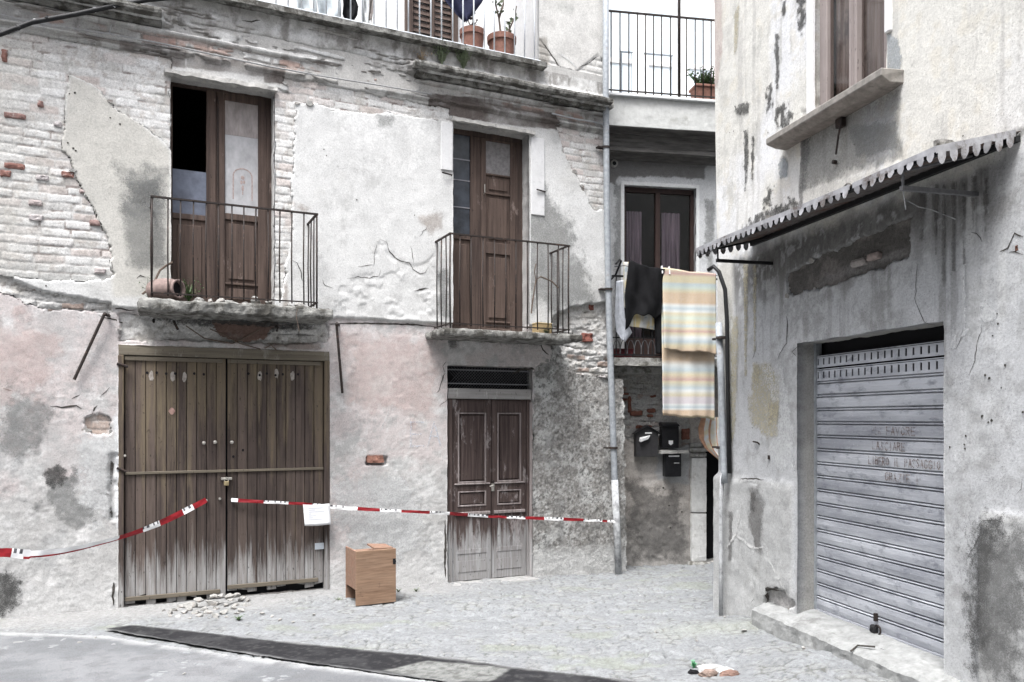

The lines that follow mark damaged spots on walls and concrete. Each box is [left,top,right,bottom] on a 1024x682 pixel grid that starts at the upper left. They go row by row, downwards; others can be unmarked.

water stain [781,0,806,30]
water stain [734,102,749,115]
water stain [765,34,793,128]
spalling [0,32,328,345]
spalling [275,79,450,299]
spalling [557,124,604,211]
water stain [743,130,755,191]
water stain [744,141,805,228]
crack [355,228,428,291]
spalling [785,218,911,298]
spalling [81,414,112,435]
spalling [533,302,690,577]